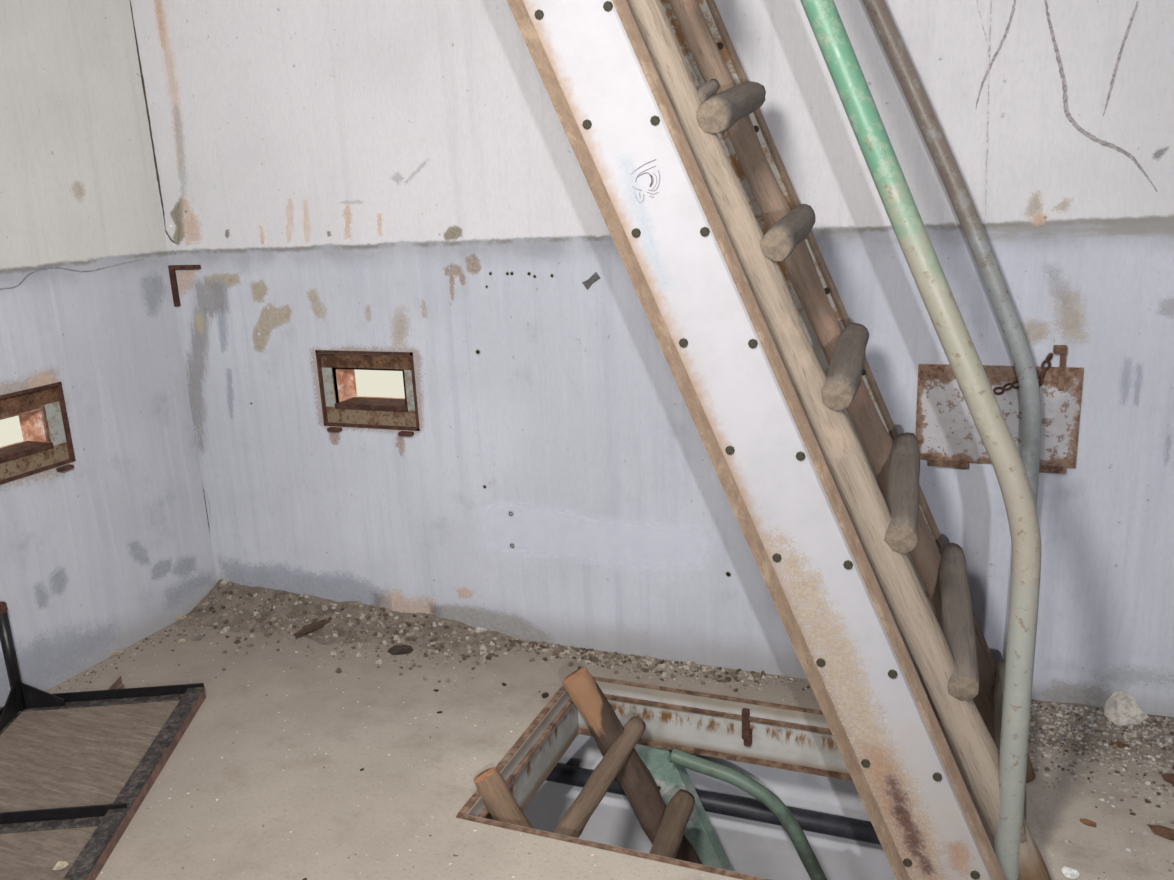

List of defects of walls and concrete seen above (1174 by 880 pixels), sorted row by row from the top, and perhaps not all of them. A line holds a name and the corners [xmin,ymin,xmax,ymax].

crack [130,1,181,244]
crack [976,0,1016,215]
crack [1044,0,1157,192]
rust [0,373,57,395]
peeling [206,273,291,352]
rust [312,350,340,445]
rust [336,307,422,456]
rust [765,529,969,880]